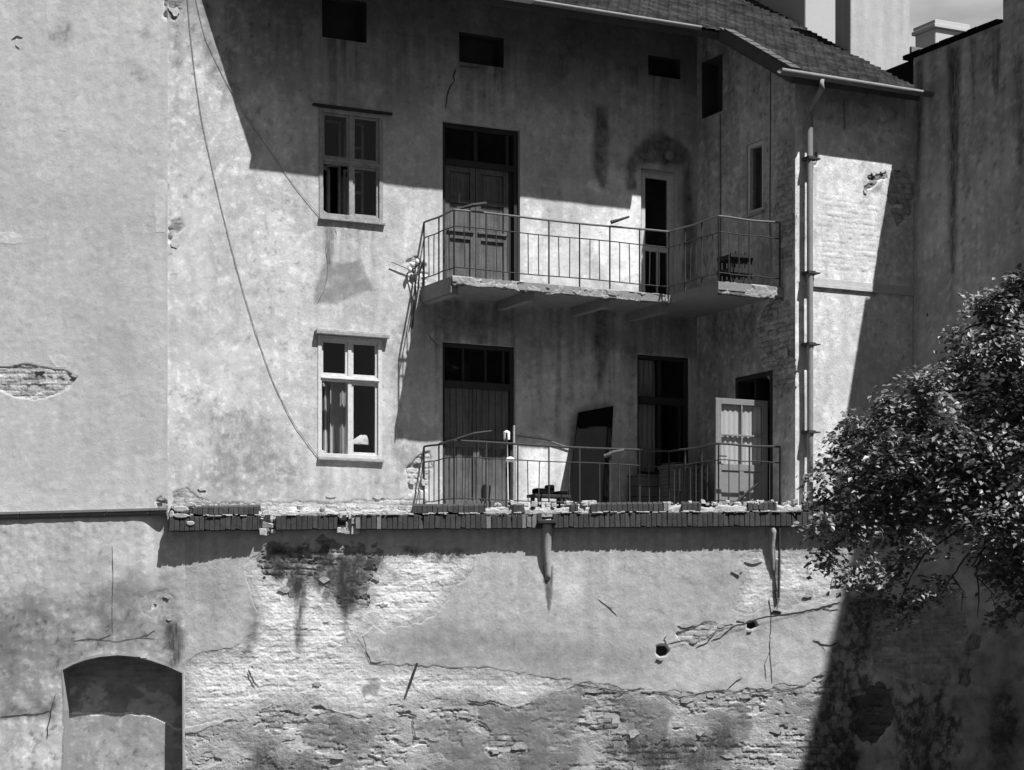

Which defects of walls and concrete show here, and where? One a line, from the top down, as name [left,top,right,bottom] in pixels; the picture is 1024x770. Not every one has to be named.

crack [445,66,476,109]
flaking render [820,166,913,272]
flaking render [0,365,78,400]
leakage [267,547,380,599]
flaking render [182,534,896,770]
crack [571,601,839,705]
crack [2,694,56,738]